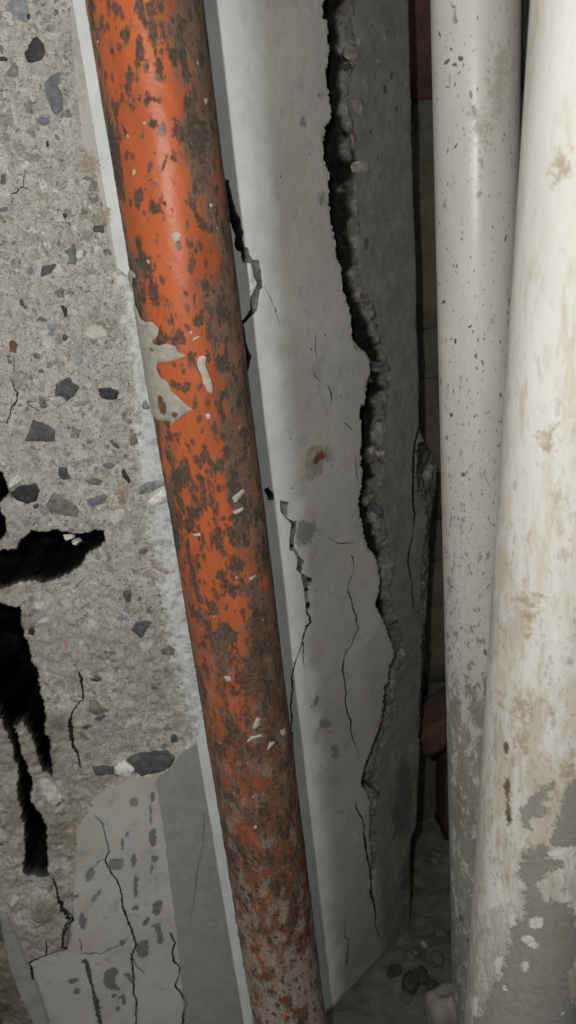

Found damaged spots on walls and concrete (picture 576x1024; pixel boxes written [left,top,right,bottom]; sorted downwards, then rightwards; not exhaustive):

crack [225,179,280,371]
spalling [0,0,202,963]
corrosion [158,395,177,417]
corrosion [311,448,328,476]
crack [322,0,420,937]
crack [0,603,145,1024]
peeling [103,968,134,1011]
crack [169,932,188,1024]